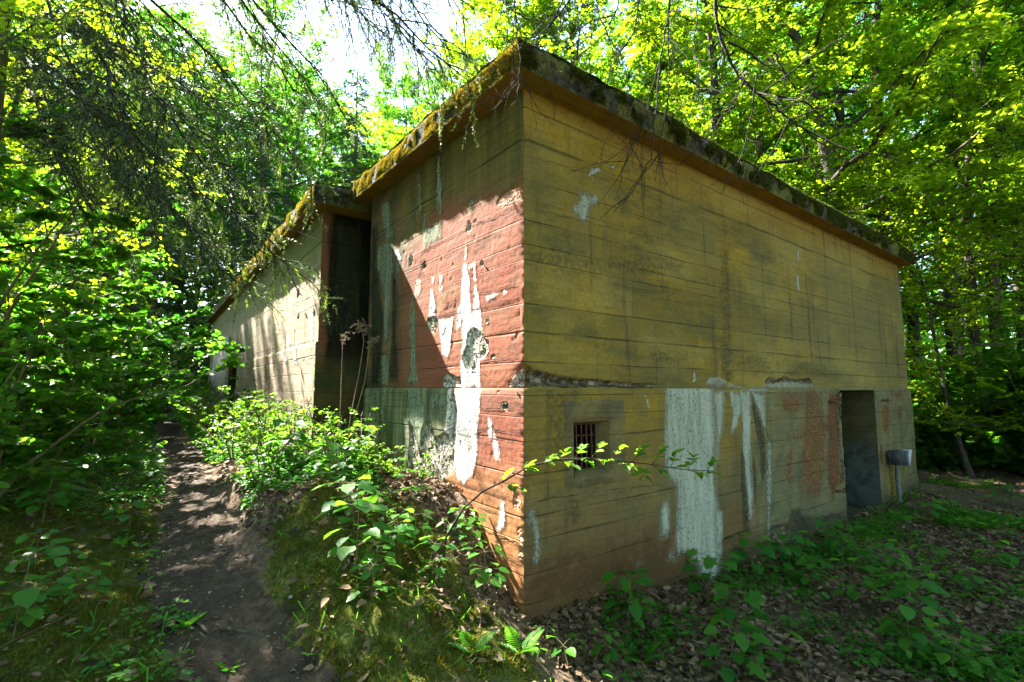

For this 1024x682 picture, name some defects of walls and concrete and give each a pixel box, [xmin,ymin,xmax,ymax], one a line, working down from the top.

leakage [418,158,442,248]
leakage [327,201,507,483]
spalling [407,316,495,480]
spalling [497,366,658,410]
corrosion [783,393,840,499]